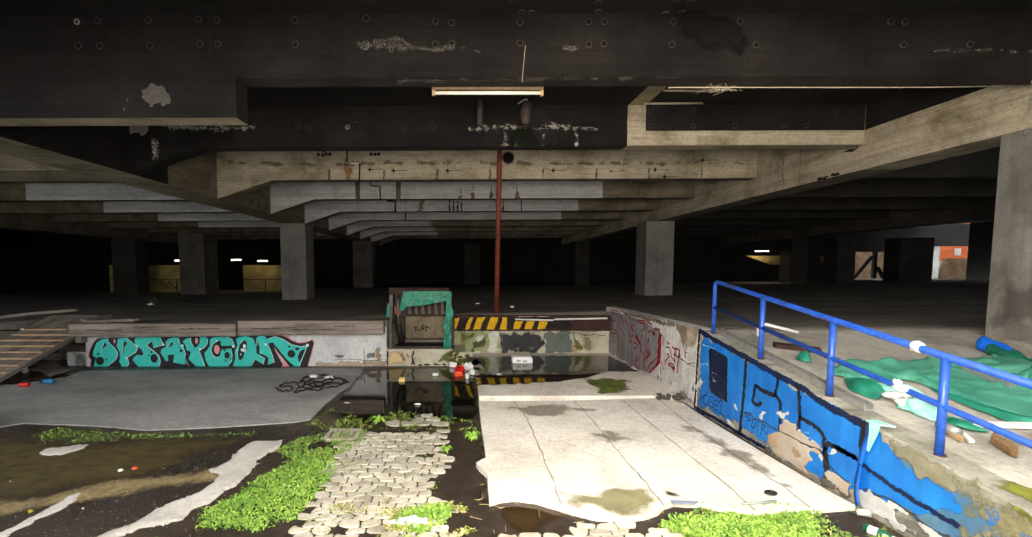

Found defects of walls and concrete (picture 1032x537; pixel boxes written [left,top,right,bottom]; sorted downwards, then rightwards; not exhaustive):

peeling [141,83,171,107]
spalling [620,309,699,352]
peeling [759,411,942,537]
peeling [889,440,957,492]